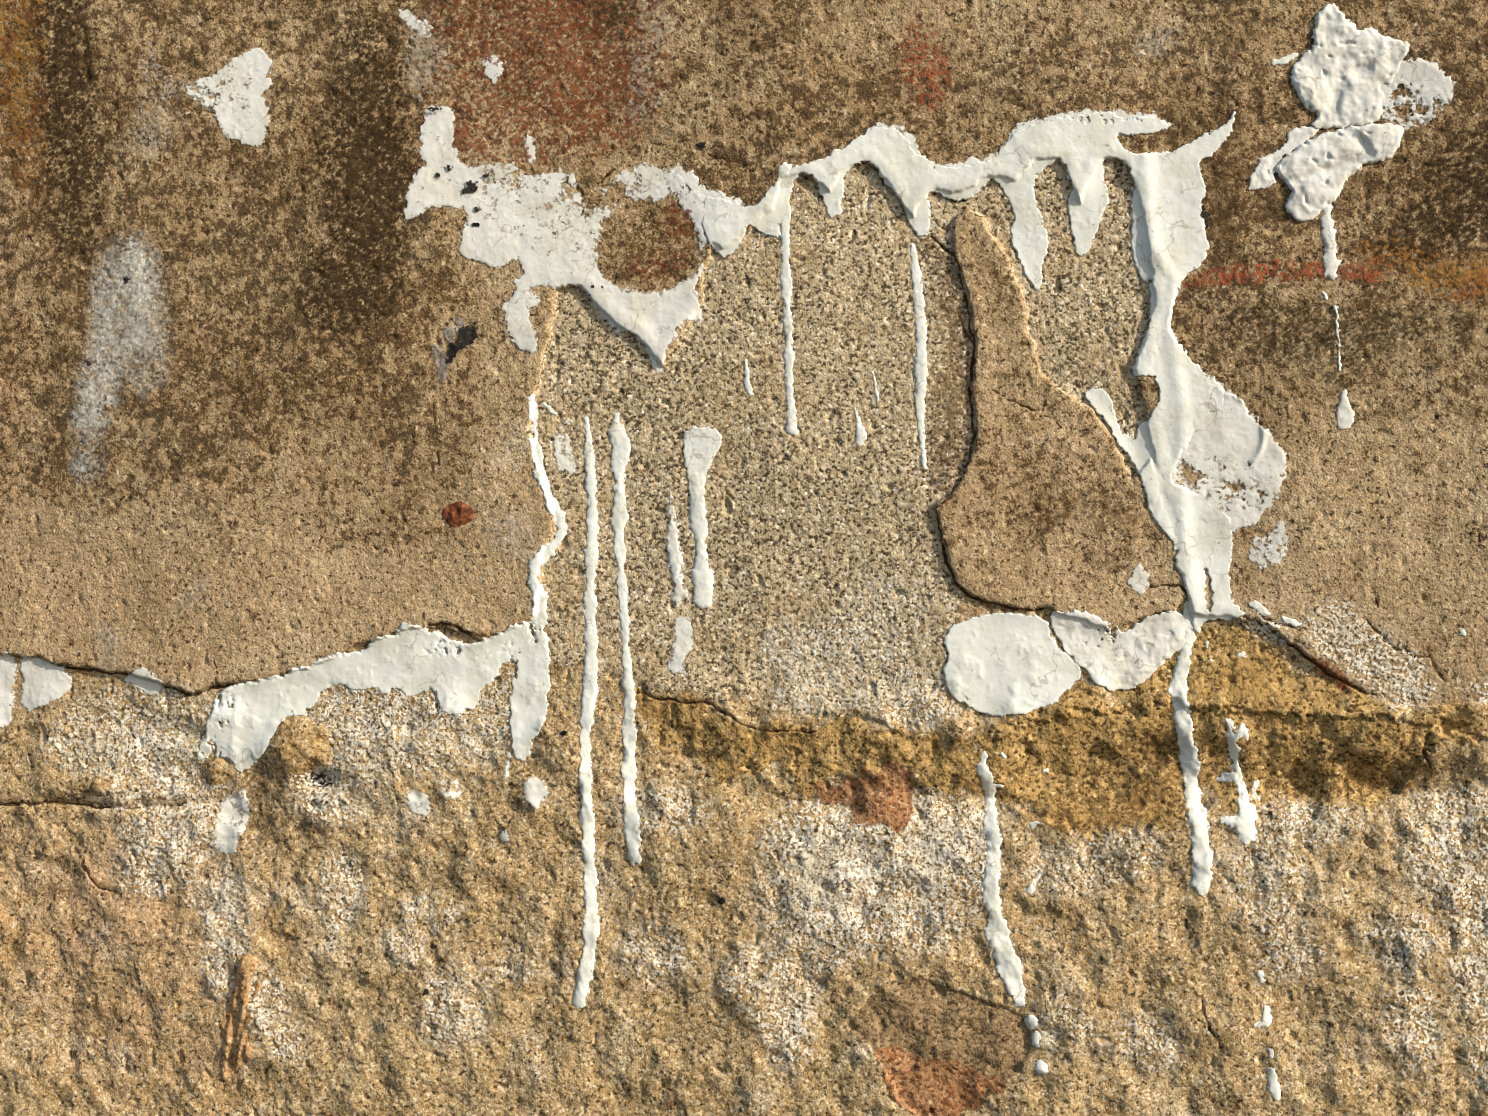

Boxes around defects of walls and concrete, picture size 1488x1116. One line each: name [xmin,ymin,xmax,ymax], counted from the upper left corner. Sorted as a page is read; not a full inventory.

corrosion [428,0,665,161]
peeling [1248,3,1456,280]
corrosion [1182,239,1488,302]
crack [930,236,1062,612]
corrosion [442,501,474,527]
spalling [197,105,1483,896]
crack [428,621,485,638]
crack [52,660,249,697]
crack [635,691,817,734]